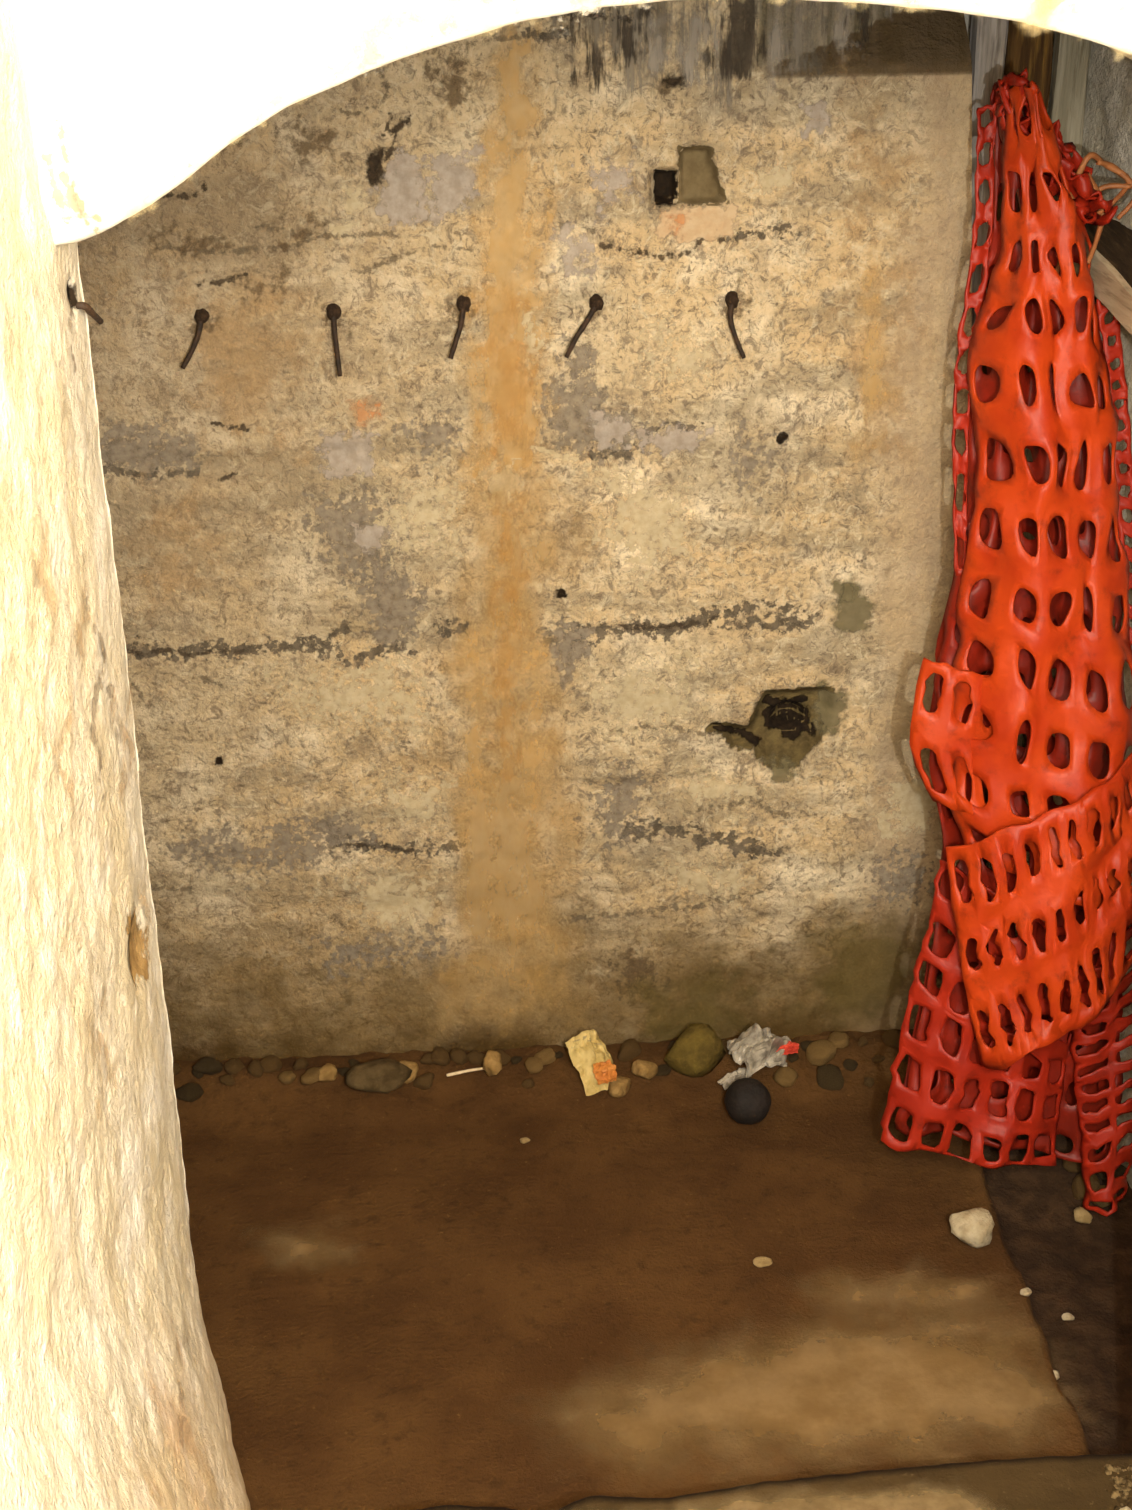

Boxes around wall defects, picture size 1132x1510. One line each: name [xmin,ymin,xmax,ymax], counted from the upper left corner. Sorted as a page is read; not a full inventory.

damp [553,0,872,108]
spalling [572,145,739,243]
peeling [720,412,787,513]
spalling [572,647,848,826]